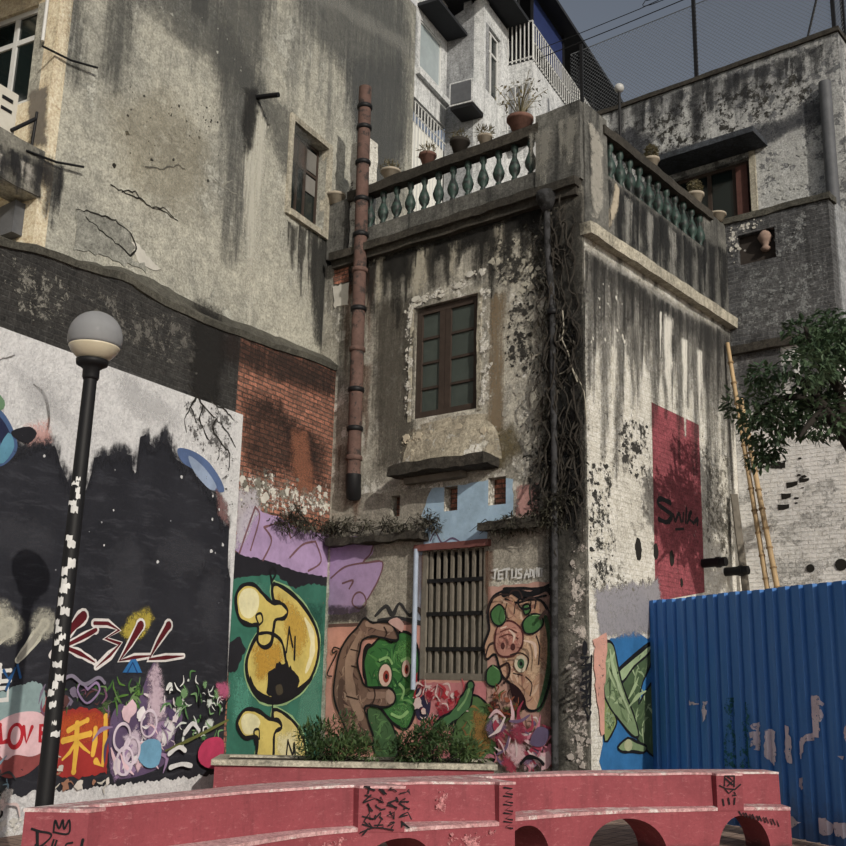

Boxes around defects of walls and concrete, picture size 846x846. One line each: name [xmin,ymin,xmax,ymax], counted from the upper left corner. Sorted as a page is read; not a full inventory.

flaking render [73,208,161,273]
crack [110,184,178,221]
damp [142,0,307,276]
damp [608,179,728,310]
damp [610,45,823,155]
flaking render [4,258,198,375]
crack [184,383,236,471]
damp [366,216,549,530]
peeling [404,227,545,416]
damp [585,252,819,486]
peeling [566,415,652,769]
peeling [448,830,496,846]